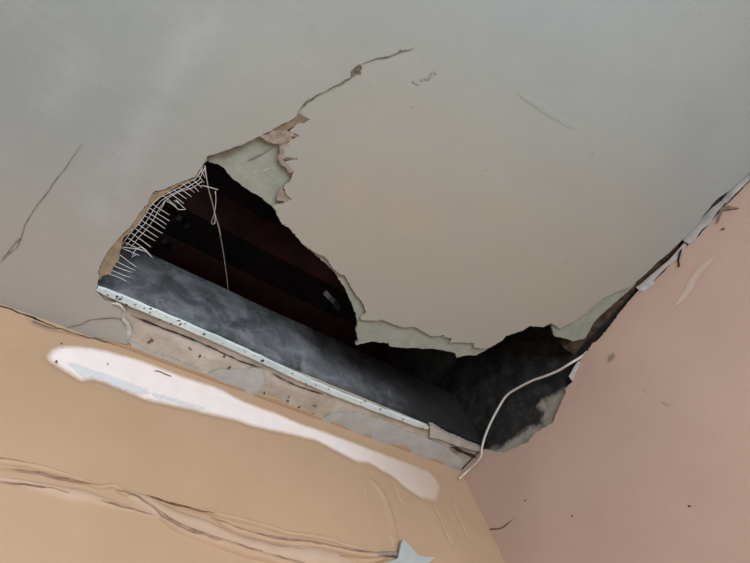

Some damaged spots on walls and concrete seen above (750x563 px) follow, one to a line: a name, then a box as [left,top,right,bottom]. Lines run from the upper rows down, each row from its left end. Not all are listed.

crack [297,48,414,115]
crack [2,143,83,261]
peeling [98,290,638,471]